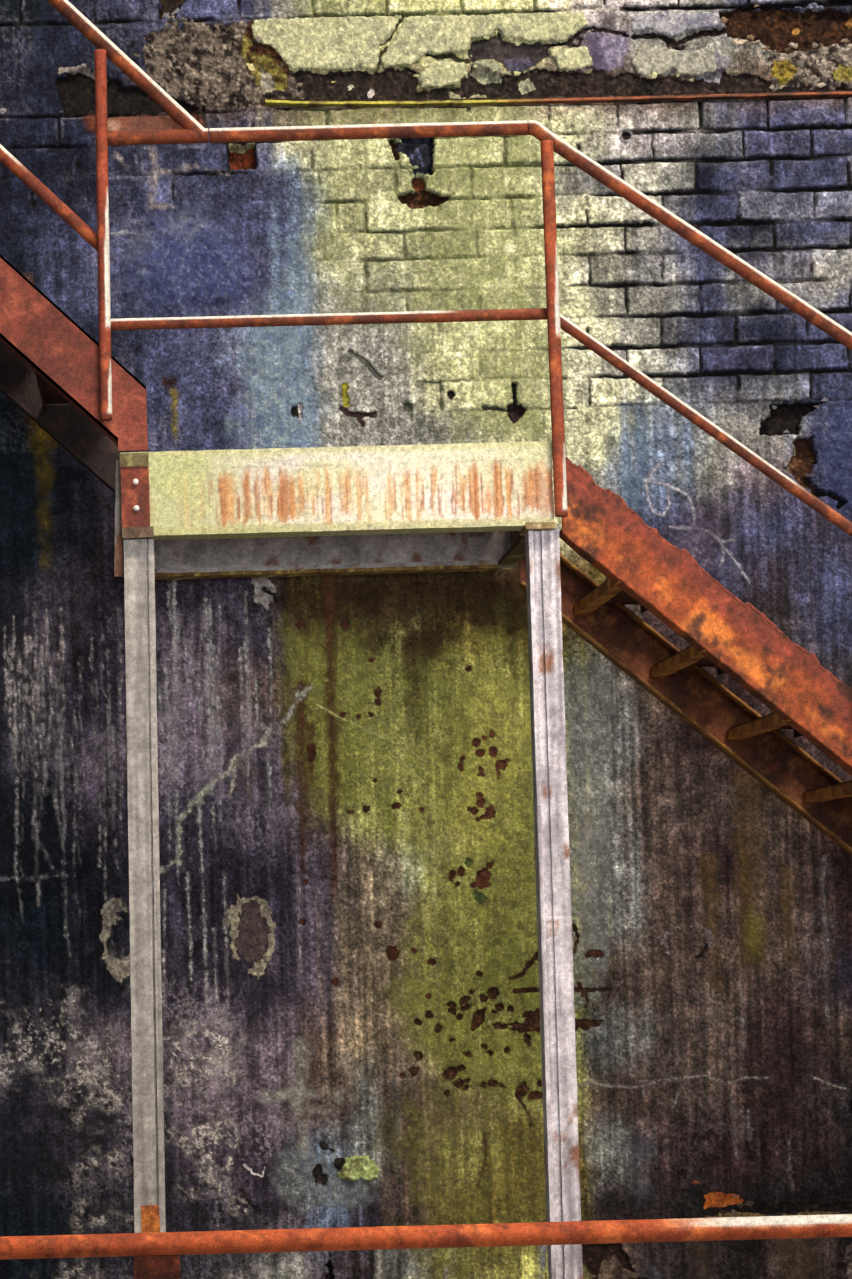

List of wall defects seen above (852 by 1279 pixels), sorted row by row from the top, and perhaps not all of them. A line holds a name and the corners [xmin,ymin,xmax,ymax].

crack [375,17,404,73]
crack [426,53,471,64]
peeling [55,0,852,118]
crack [545,26,726,51]
spalling [388,137,450,209]
spalling [759,398,846,510]
water stain [278,565,526,798]
water stain [159,583,229,1004]
water stain [451,682,536,986]
peeling [222,895,276,979]
water stain [275,1141,373,1212]
flaking render [682,1180,852,1218]